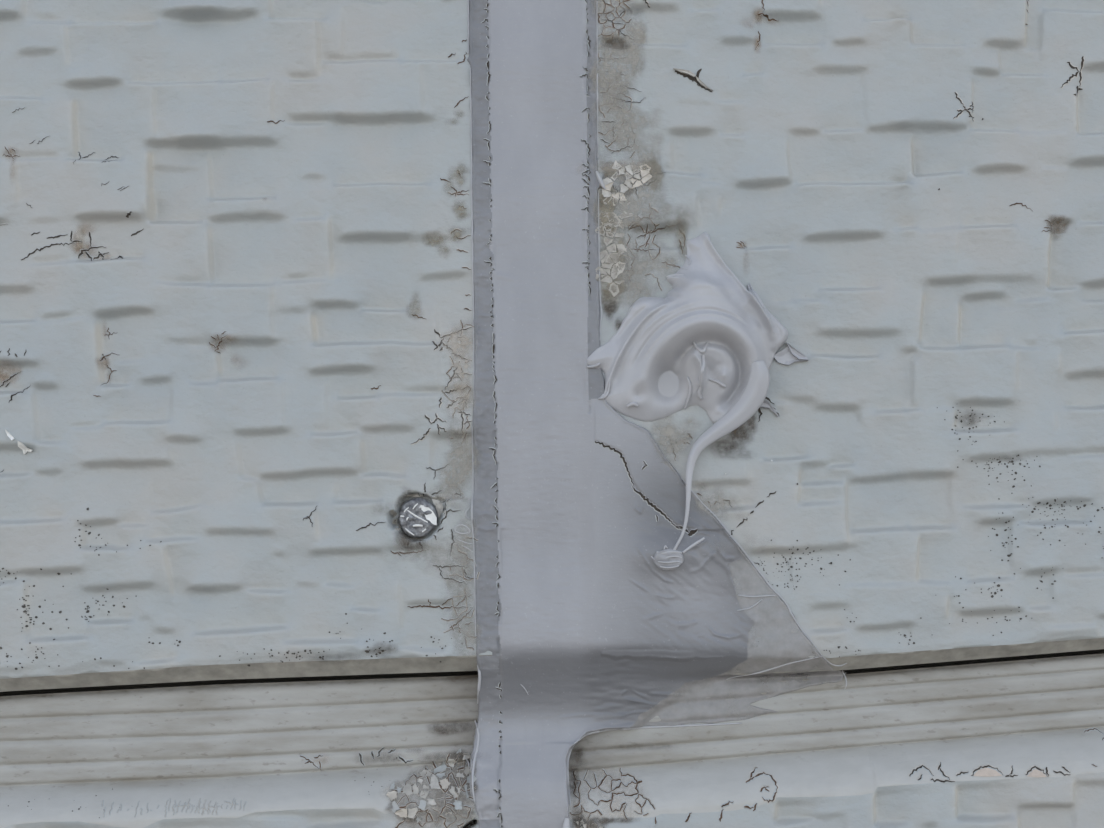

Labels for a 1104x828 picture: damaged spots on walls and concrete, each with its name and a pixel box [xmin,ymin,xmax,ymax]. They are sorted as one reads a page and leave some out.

crack [447,39,468,65]
crack [454,96,469,109]
crack [390,170,480,650]
leakage [944,407,1104,546]
crack [356,521,386,532]
leakage [754,540,851,590]
leakage [0,568,69,640]
crack [358,747,477,828]
peeling [908,761,1071,784]